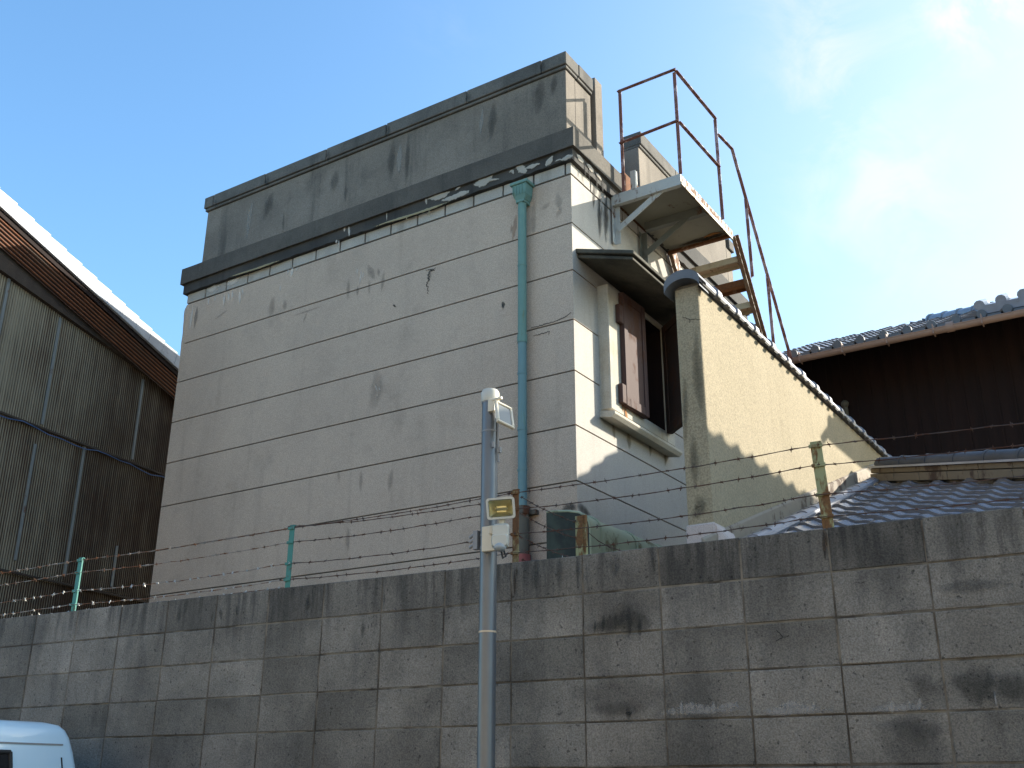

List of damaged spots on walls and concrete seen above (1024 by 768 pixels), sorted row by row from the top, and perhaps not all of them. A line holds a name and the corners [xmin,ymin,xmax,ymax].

flaking render [377,154,604,226]
water stain [593,186,608,237]
corrosion [682,232,722,245]